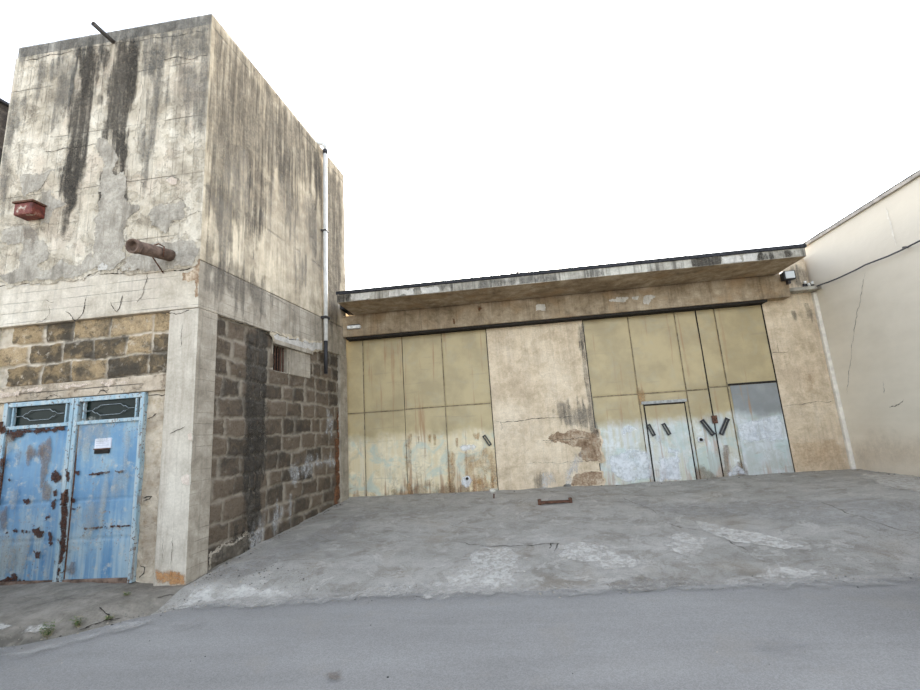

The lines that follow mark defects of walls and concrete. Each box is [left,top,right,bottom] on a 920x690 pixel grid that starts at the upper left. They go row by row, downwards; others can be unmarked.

spalling [0,137,200,301]
leakage [13,13,351,324]
corrosion [0,425,65,442]
spalling [543,428,606,486]
leakage [561,378,597,432]
corrosion [5,470,124,582]